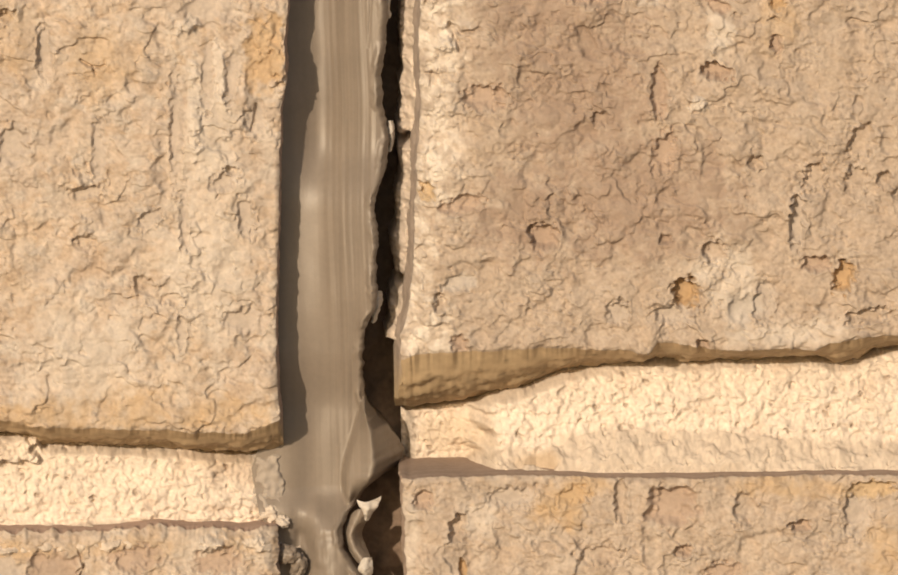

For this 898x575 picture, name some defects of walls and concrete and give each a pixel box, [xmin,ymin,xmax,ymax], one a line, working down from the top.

crack [362,0,401,441]
crack [343,463,404,575]